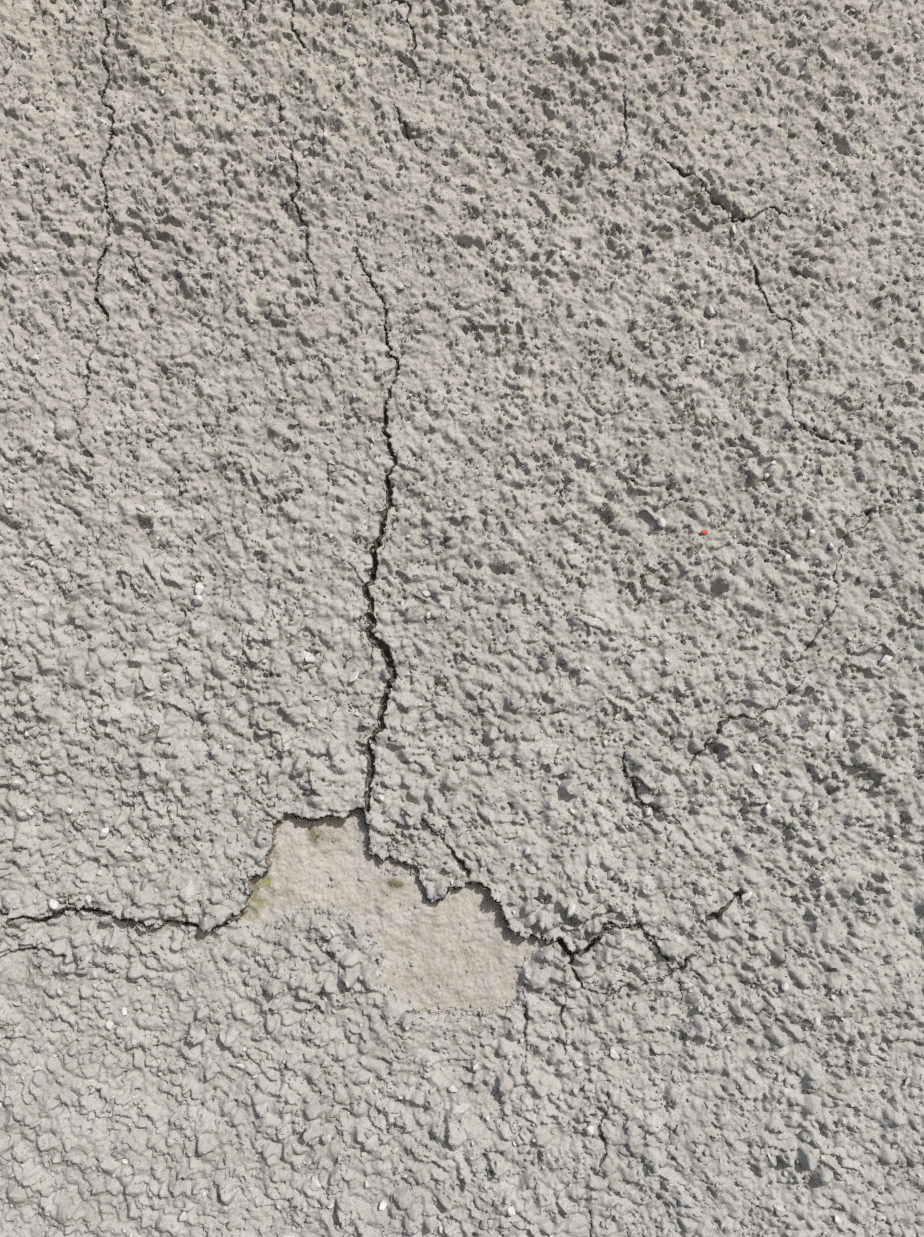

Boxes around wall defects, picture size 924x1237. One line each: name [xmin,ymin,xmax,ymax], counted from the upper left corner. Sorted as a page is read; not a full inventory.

spalling [289,6,607,159]
crack [76,0,115,502]
spalling [445,140,650,284]
crack [662,157,845,444]
spalling [171,564,220,605]
crack [335,245,402,812]
spalling [347,670,452,748]
crack [423,819,470,877]
crack [621,741,681,824]
crack [0,899,248,970]
spalling [183,773,671,1101]
spalling [751,981,860,1091]